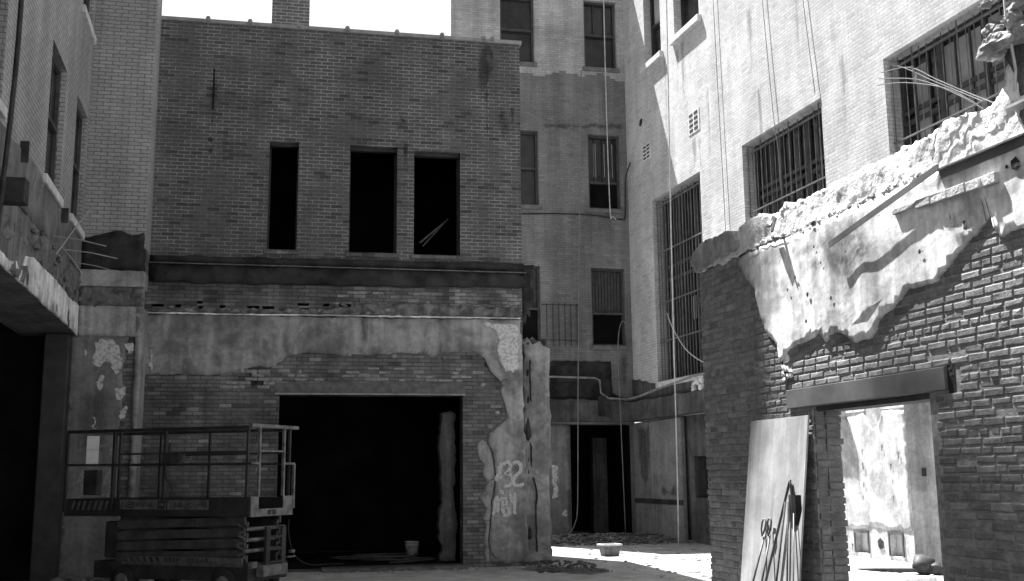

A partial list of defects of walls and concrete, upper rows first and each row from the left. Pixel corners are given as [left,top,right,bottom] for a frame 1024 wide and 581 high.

spalling [975,0,1024,62]
flaking render [739,146,1024,381]
flaking render [0,214,529,580]
crack [483,357,532,559]
crack [530,443,538,552]